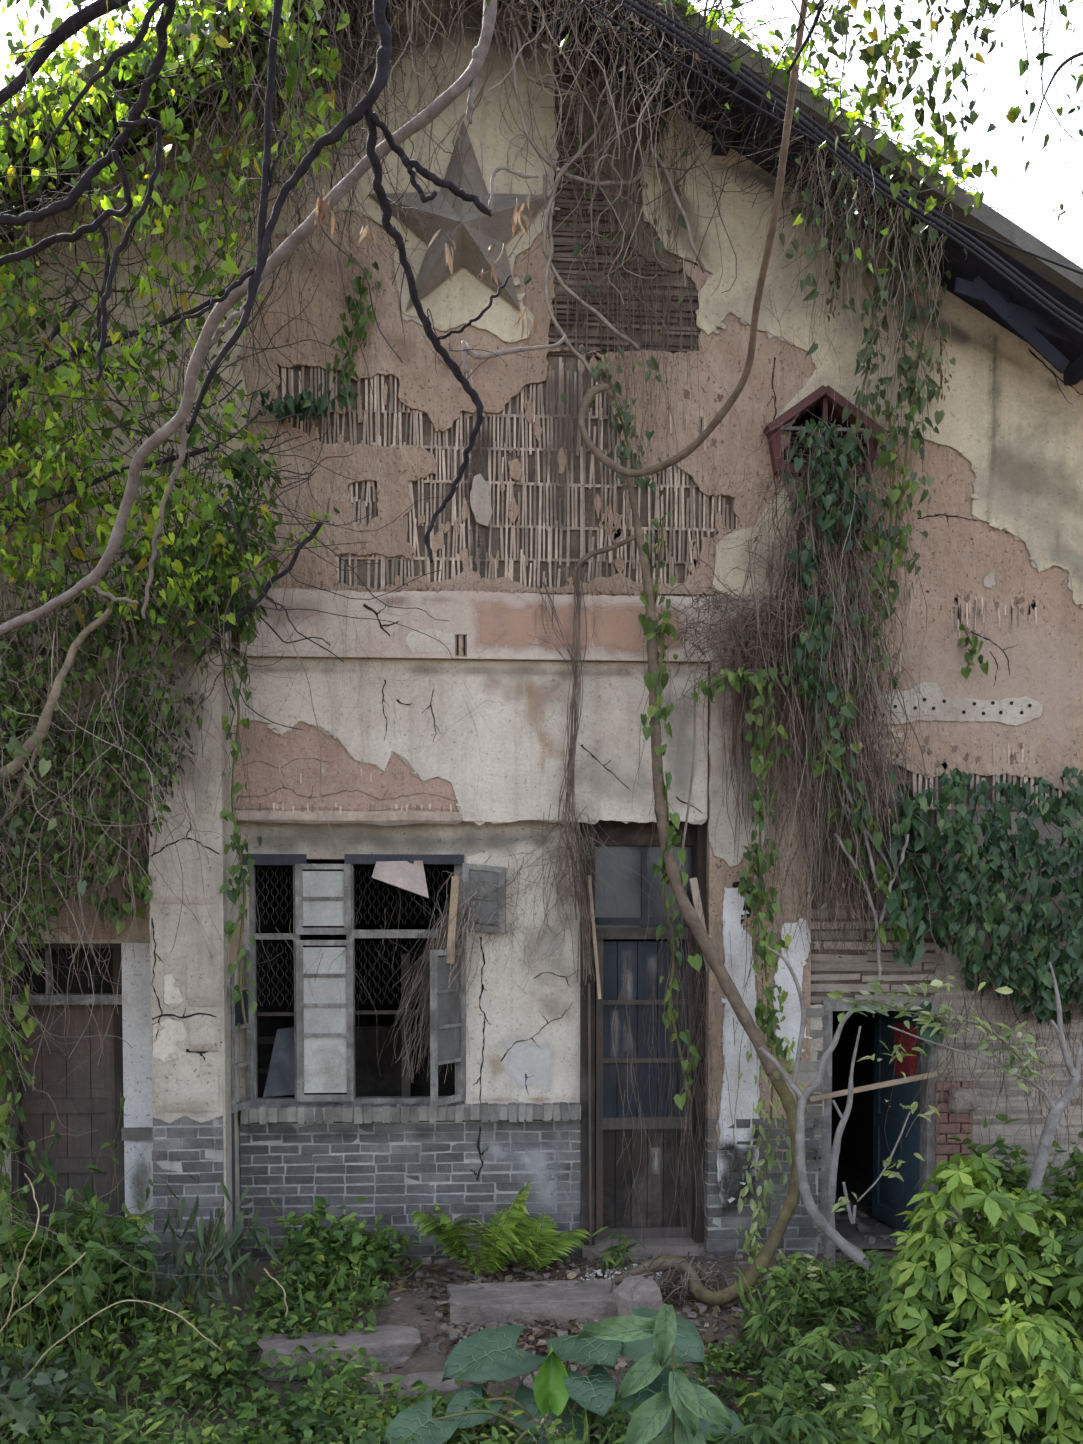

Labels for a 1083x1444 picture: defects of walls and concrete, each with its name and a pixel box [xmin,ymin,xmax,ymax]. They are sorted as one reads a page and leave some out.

peeling [237,207,816,595]
peeling [233,721,467,815]
crack [382,680,441,742]
peeling [852,430,1083,794]
crack [151,917,222,1061]
crack [470,937,580,1181]
peeling [716,880,812,1203]